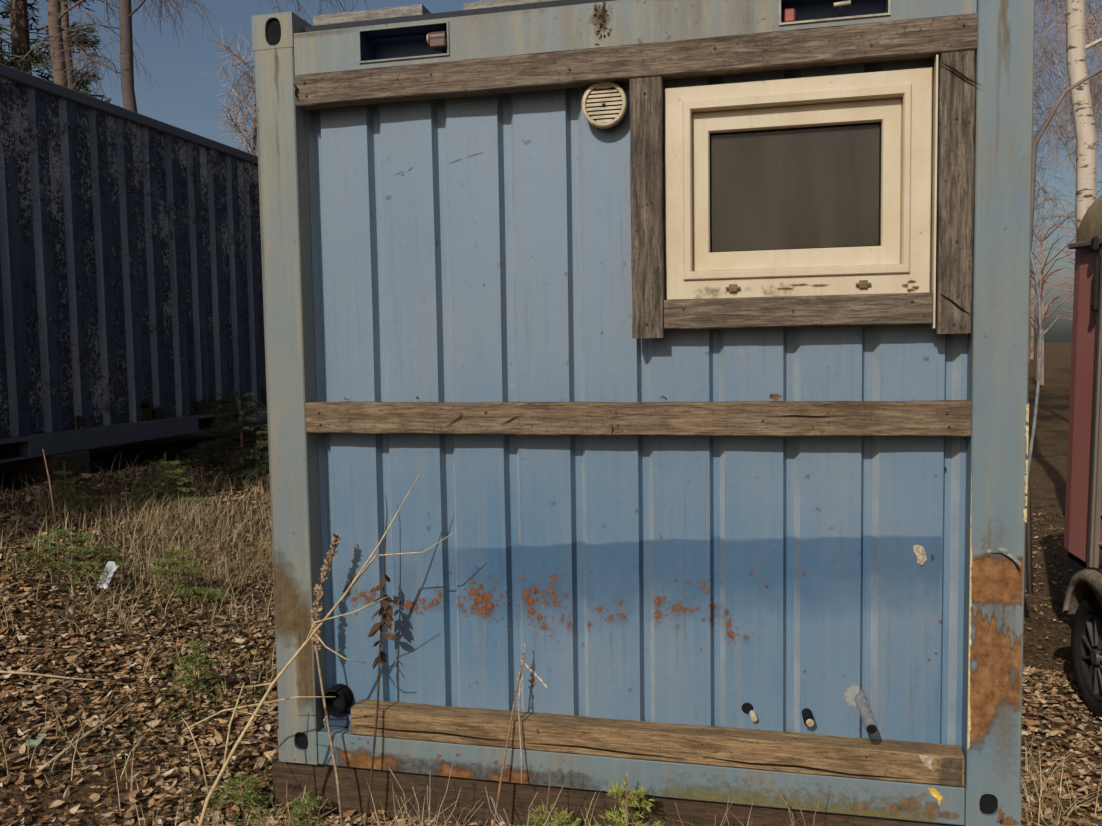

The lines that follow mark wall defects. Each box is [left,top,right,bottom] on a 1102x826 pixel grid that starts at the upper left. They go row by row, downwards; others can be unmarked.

rust [594,2,612,45]
rust [273,564,313,701]
rust [339,574,376,615]
rust [395,564,627,642]
rust [649,565,748,646]
rust [970,555,1023,743]
peeling [986,547,1022,566]
rust [998,809,1017,826]